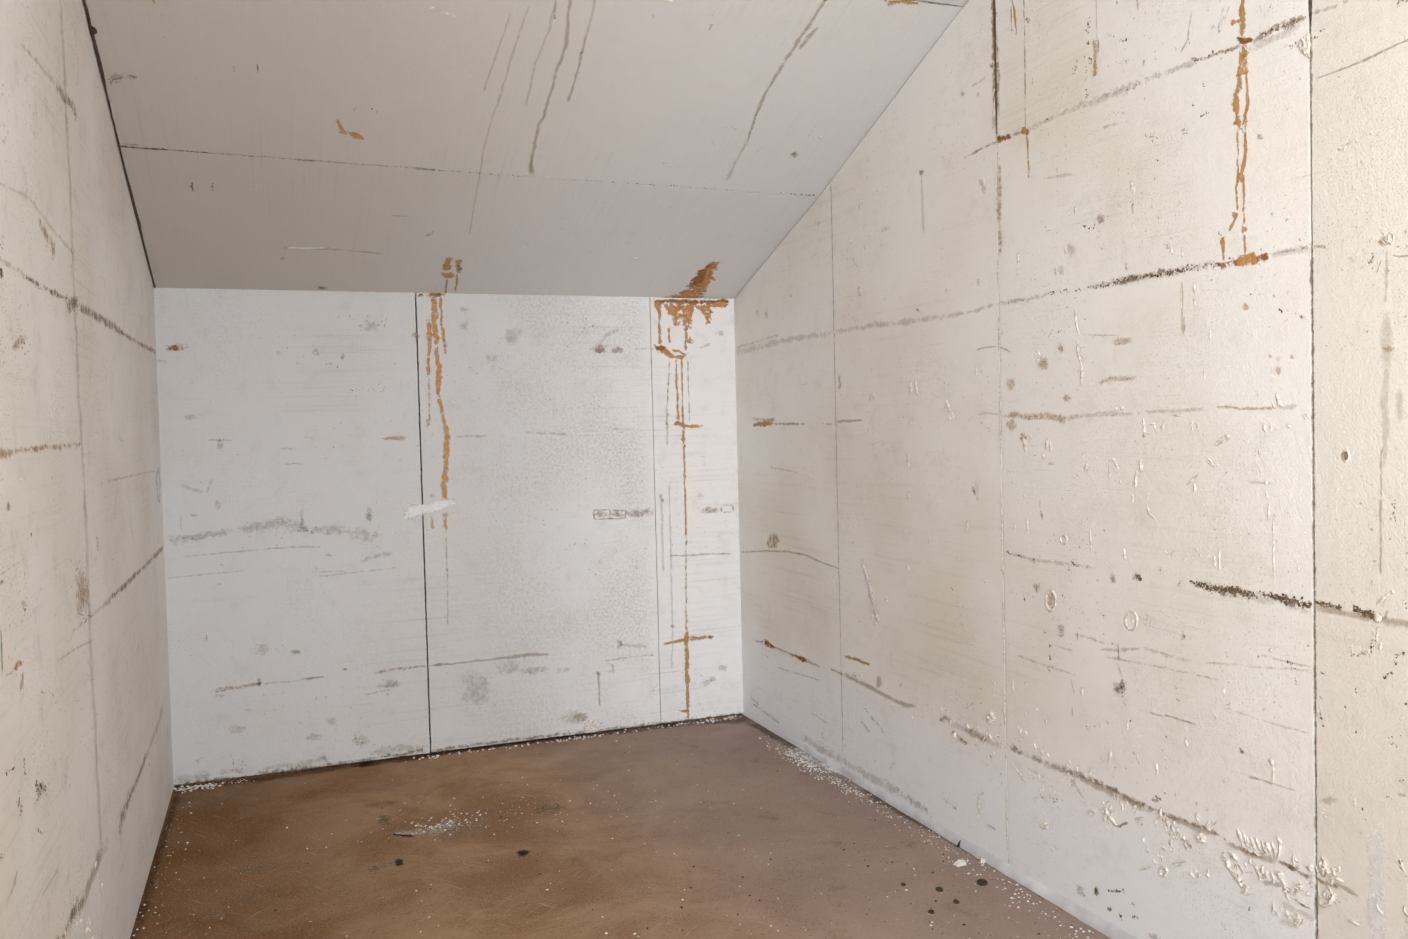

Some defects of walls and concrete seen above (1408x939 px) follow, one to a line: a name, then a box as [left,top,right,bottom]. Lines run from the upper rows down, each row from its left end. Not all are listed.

rust [1217,0,1269,269]
rust [414,257,462,594]
rust [654,262,728,718]
peeling [940,680,1344,927]